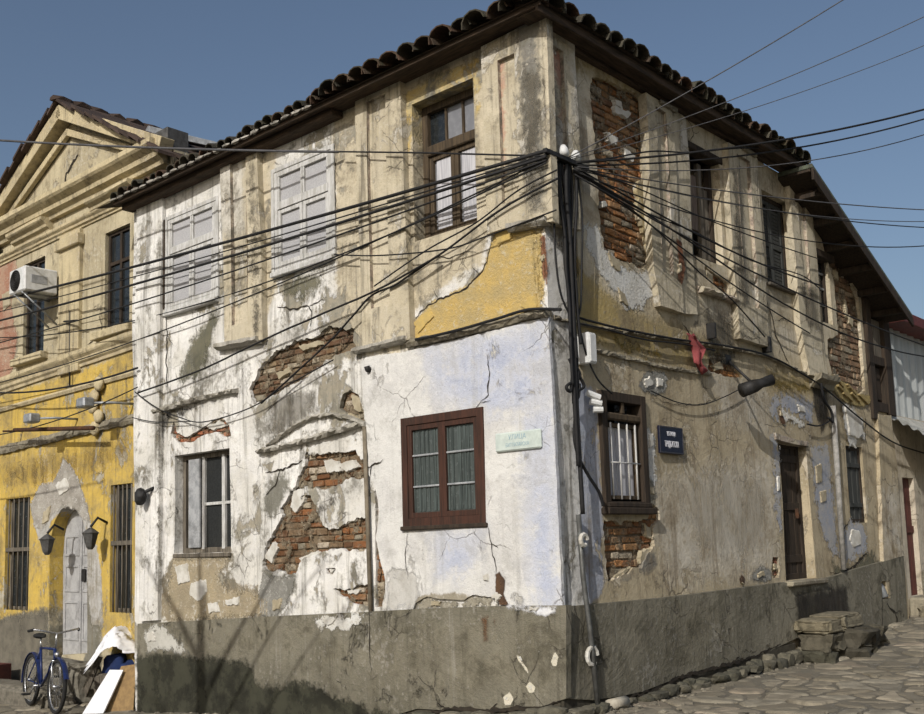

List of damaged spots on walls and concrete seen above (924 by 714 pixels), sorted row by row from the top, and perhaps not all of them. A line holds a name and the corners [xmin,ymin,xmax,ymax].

spalling [583,79,653,311]
peeling [414,228,548,338]
spalling [252,327,356,402]
spalling [828,262,871,448]
spalling [30,458,91,530]
spalling [173,418,231,442]
spalling [144,451,366,656]
peeling [315,547,385,632]
spalling [603,428,658,580]
peeling [767,389,815,534]
peeling [810,439,868,564]
leakage [134,650,391,714]